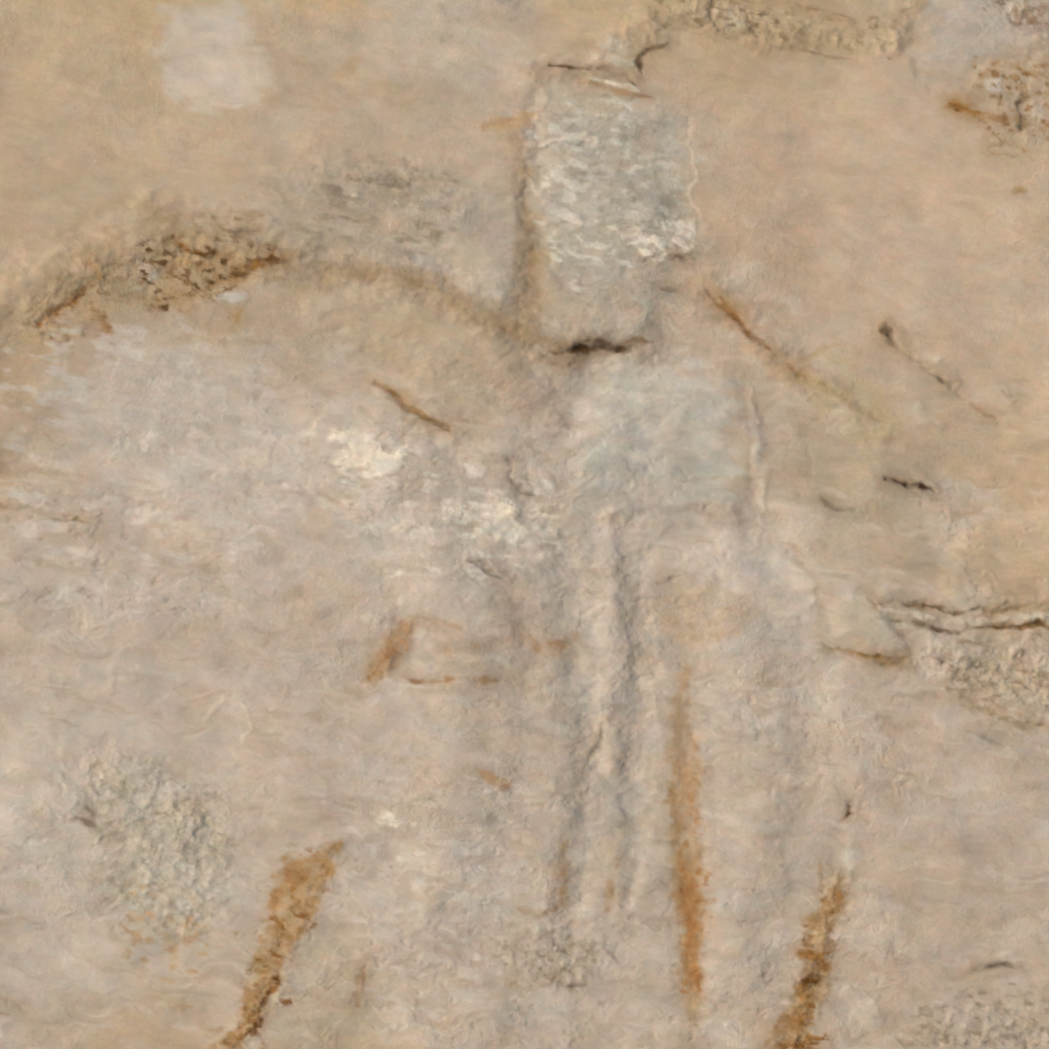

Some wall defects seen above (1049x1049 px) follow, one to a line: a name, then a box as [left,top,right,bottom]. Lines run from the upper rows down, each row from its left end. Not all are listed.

crack [533,4,698,101]
corrosion [10,193,302,364]
peeling [239,85,719,330]
crack [540,333,656,372]
crack [876,318,1014,429]
crack [810,576,1049,671]
corrosion [637,576,756,1040]
corrosion [199,836,346,1049]
corrosion [760,792,863,1049]